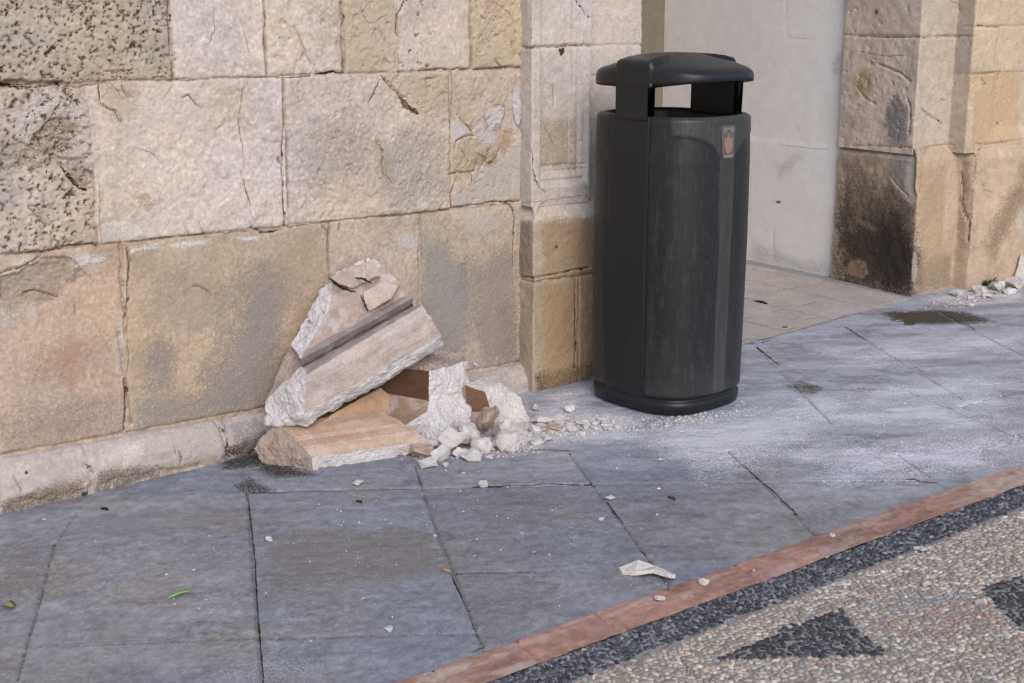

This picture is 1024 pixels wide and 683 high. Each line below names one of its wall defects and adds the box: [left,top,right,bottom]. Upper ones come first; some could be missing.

crack [0,0,588,430]
spalling [376,85,521,220]
damp [880,308,995,325]